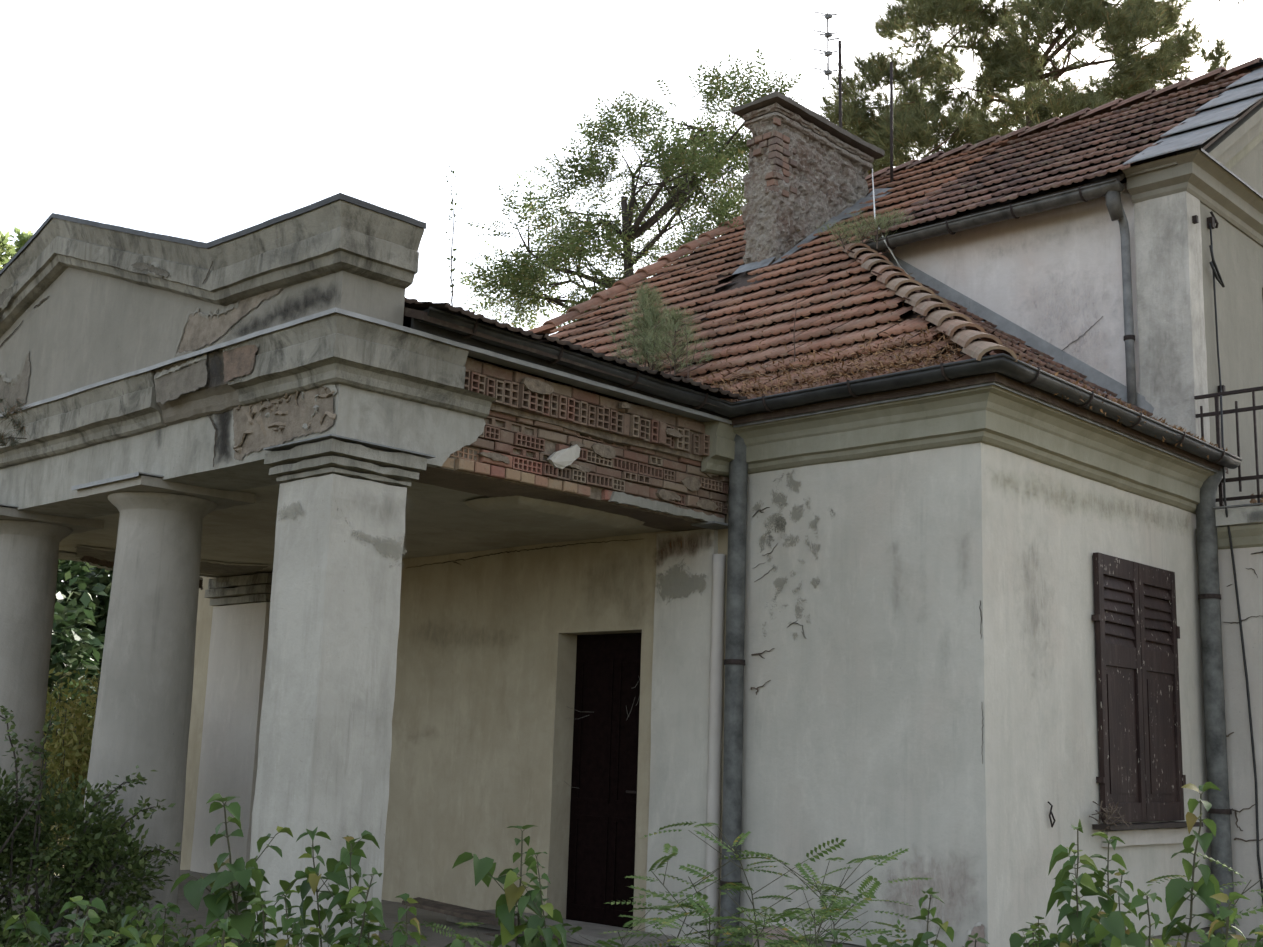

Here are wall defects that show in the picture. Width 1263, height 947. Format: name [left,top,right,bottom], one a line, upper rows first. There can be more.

flaking render [0,352,30,413]
flaking render [154,287,283,404]
flaking render [233,384,338,460]
flaking render [436,357,729,523]
flaking render [657,565,706,599]
flaking render [753,473,833,615]